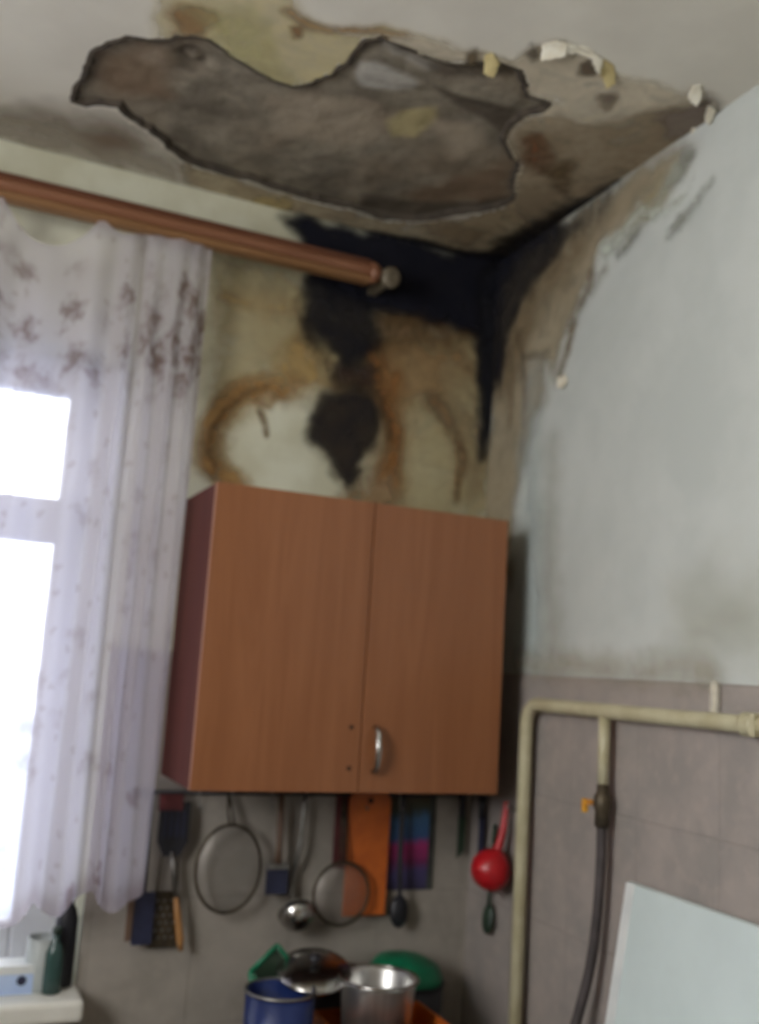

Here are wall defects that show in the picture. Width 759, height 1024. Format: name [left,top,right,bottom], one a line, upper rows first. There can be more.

flaking render [70,34,717,232]
corrosion [200,377,296,485]
water stain [183,151,692,576]